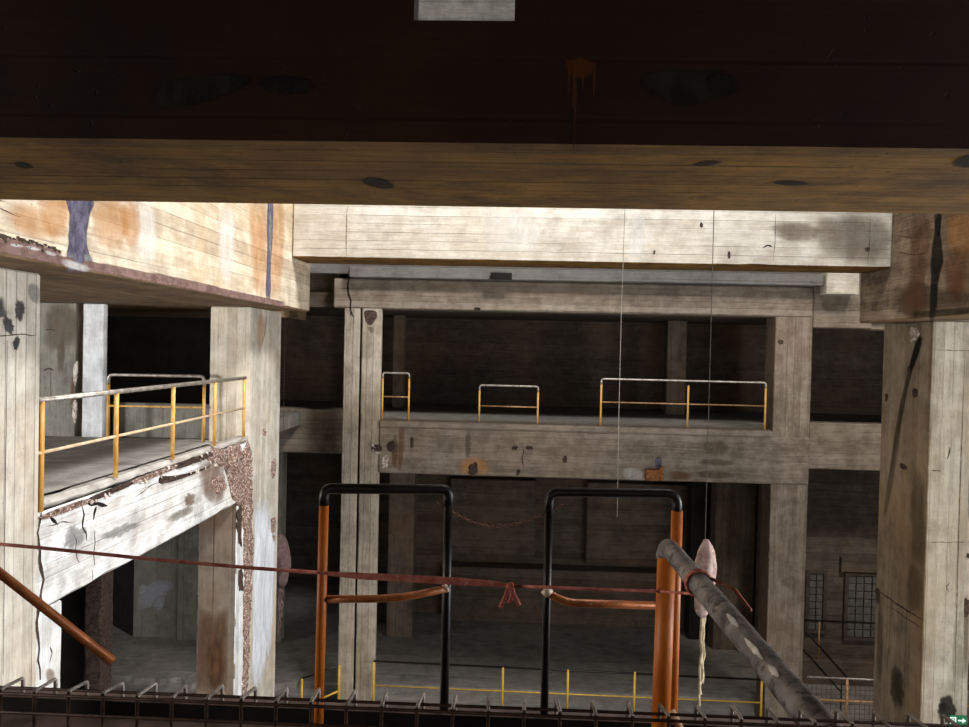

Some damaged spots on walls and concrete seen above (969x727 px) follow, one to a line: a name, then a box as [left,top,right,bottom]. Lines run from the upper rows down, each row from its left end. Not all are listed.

water stain [0,286,39,350]
spalling [0,234,61,254]
corrosion [914,308,969,317]
water stain [887,337,922,501]
crack [35,482,123,680]
spalling [39,442,254,695]